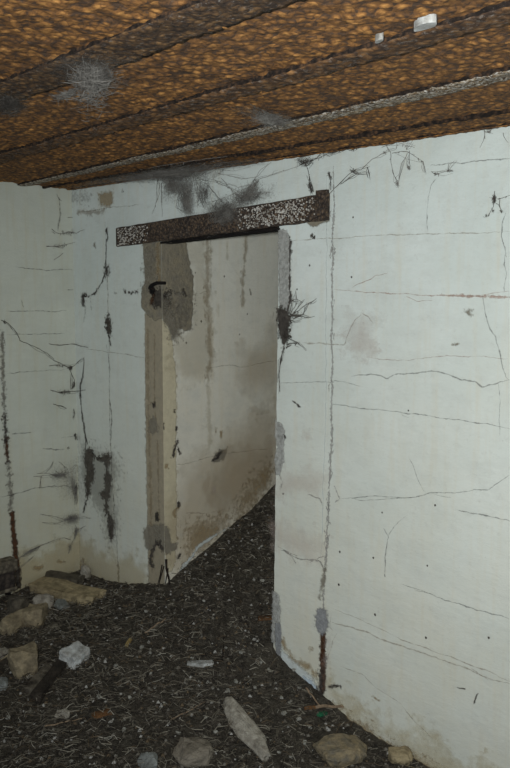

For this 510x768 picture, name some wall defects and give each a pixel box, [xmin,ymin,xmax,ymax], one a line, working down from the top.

crack [79,364,88,447]
crack [311,166,411,609]
rust [0,333,22,592]
water stain [82,447,115,542]
rust [315,608,328,697]